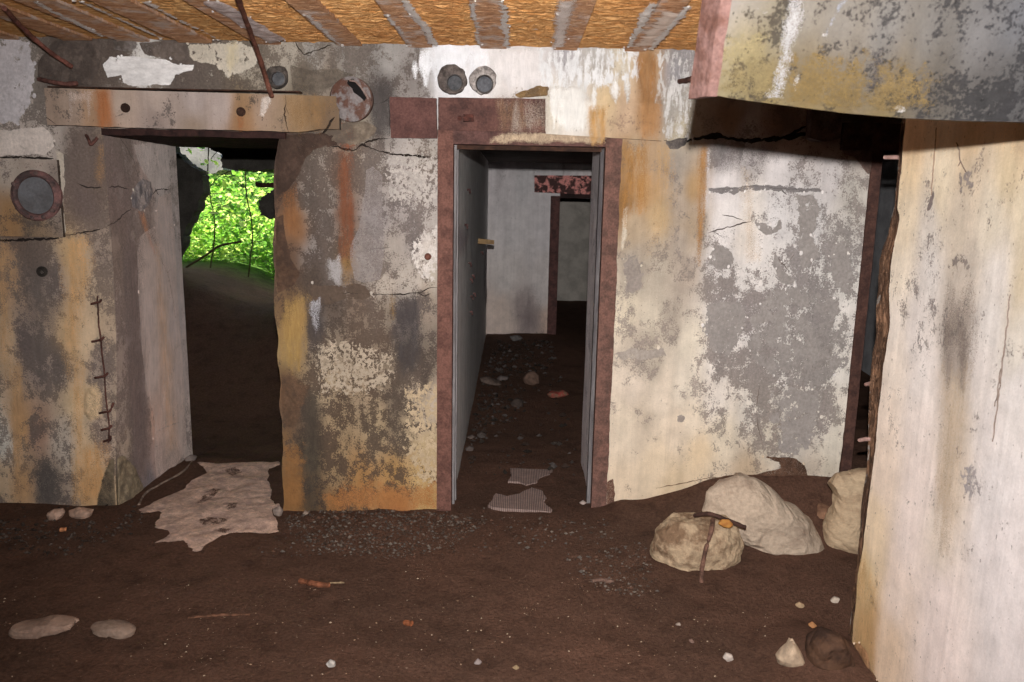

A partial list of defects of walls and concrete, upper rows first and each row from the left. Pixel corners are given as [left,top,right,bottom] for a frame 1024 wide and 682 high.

peeling [91,29,267,86]
crack [322,98,430,158]
rust [619,50,663,228]
crack [664,126,806,145]
rust [336,127,356,286]
crack [709,215,751,236]
crack [339,287,437,296]
water stain [304,297,328,357]